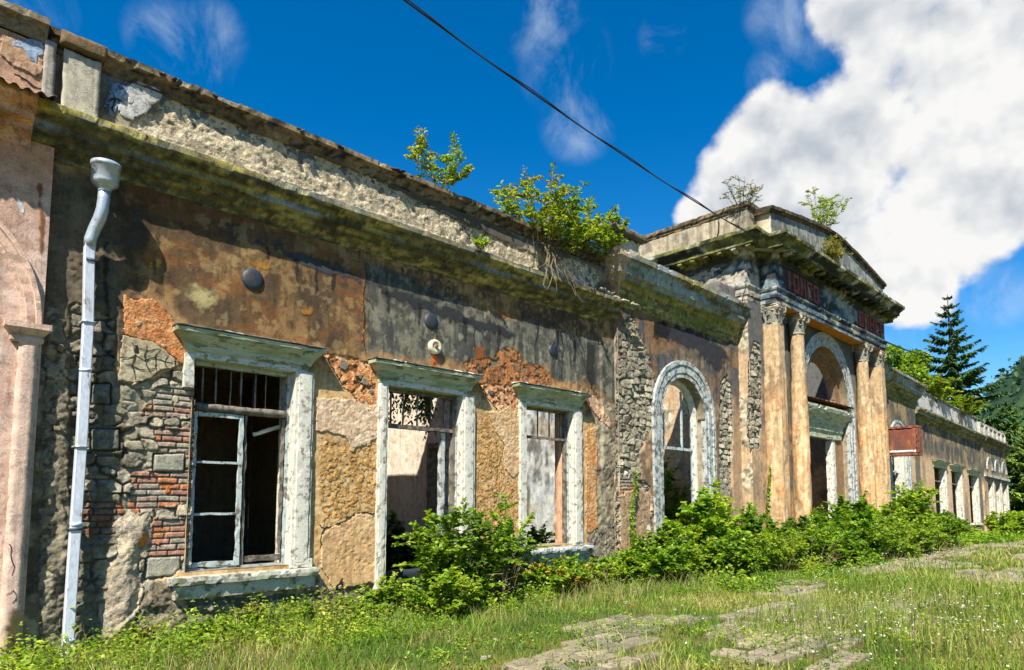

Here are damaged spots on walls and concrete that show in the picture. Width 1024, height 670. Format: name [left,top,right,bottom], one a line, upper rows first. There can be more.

peeling [0,35,44,78]
leakage [37,183,45,252]
leakage [355,171,524,247]
flaking render [36,294,218,648]
crack [119,342,176,379]
peeling [263,352,378,618]
crack [319,511,375,548]
spalling [104,81,655,565]
flaking render [718,375,734,504]
flaking render [747,342,762,449]